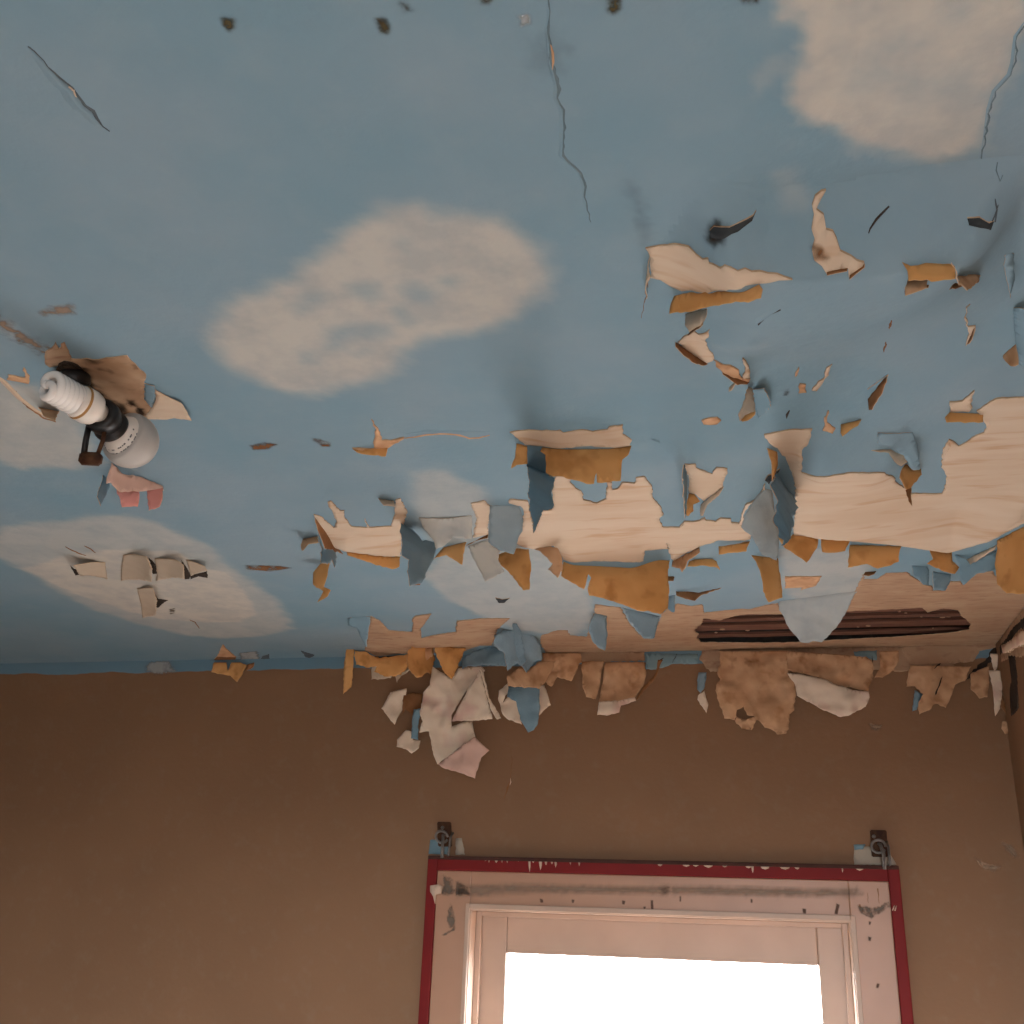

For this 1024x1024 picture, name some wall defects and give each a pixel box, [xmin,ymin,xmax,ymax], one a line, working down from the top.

crack [25,46,110,132]
crack [545,0,591,222]
crack [967,22,1024,230]
peeling [811,188,865,280]
peeling [902,262,980,296]
peeling [641,243,792,422]
flaking render [69,355,151,417]
peeling [868,374,889,410]
peeling [97,463,164,511]
peeling [121,554,208,618]
peeling [301,390,1024,734]
peeling [211,645,270,682]